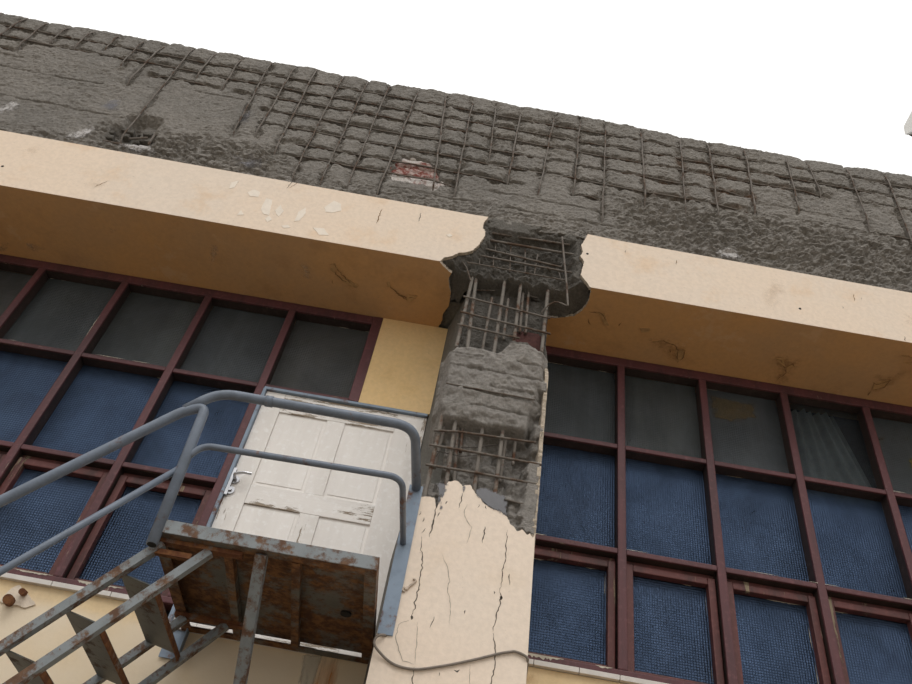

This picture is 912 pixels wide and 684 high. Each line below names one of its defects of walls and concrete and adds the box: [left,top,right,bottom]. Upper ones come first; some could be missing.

spalling [0,13,912,536]
crack [395,537,451,684]
crack [469,534,508,684]